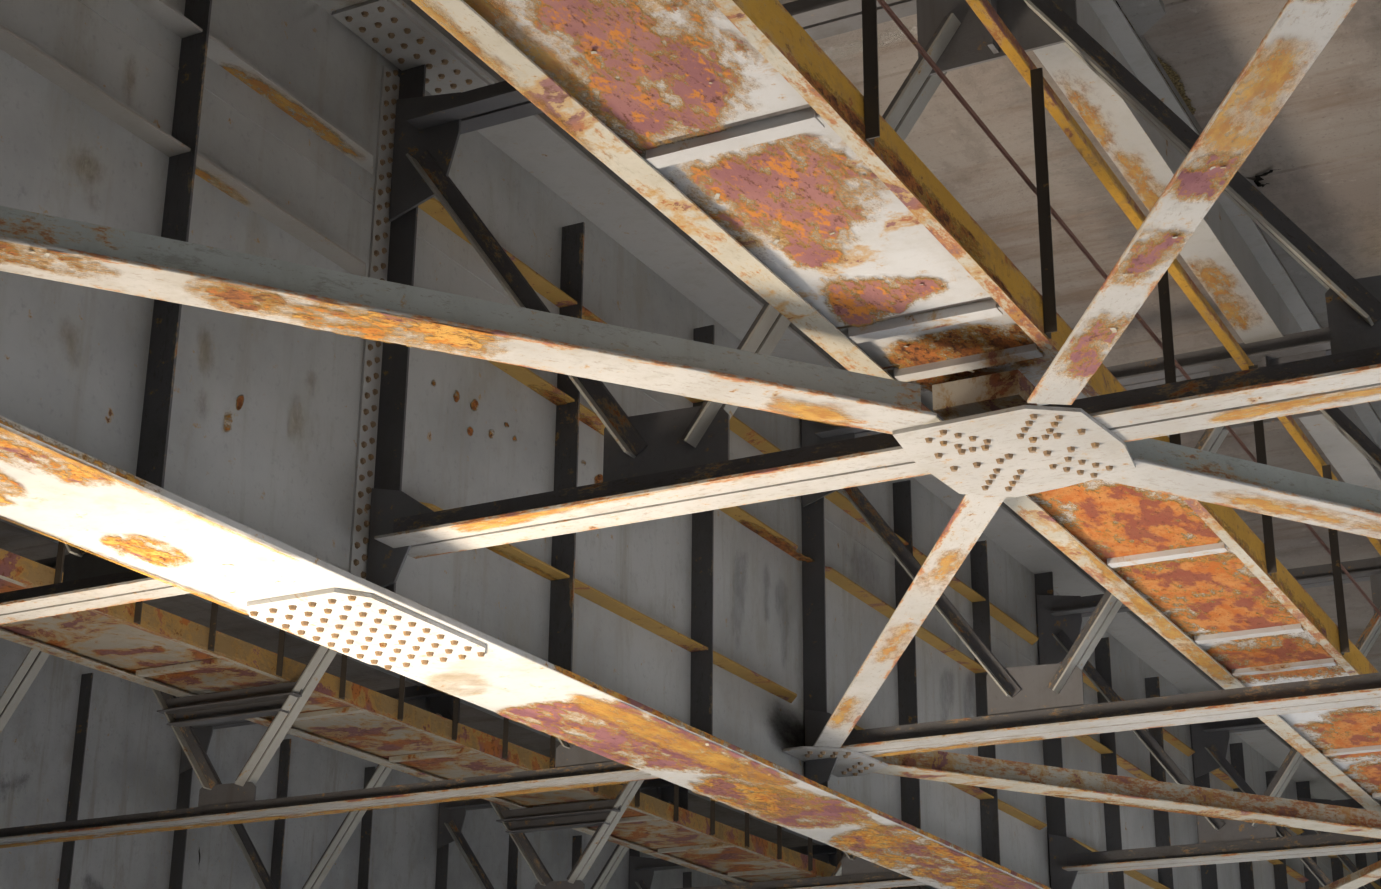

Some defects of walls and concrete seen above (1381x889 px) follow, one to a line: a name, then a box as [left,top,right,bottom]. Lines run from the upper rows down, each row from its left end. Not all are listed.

corrosion [411,0,590,151]
corrosion [1068,41,1303,212]
corrosion [0,241,118,278]
corrosion [188,279,507,357]
corrosion [1055,314,1133,381]
corrosion [1113,230,1259,330]
corrosion [0,418,295,560]
corrosion [921,551,963,585]
corrosion [1028,480,1381,684]
corrosion [0,782,625,849]
corrosion [497,664,1052,889]
corrosion [1305,707,1381,796]